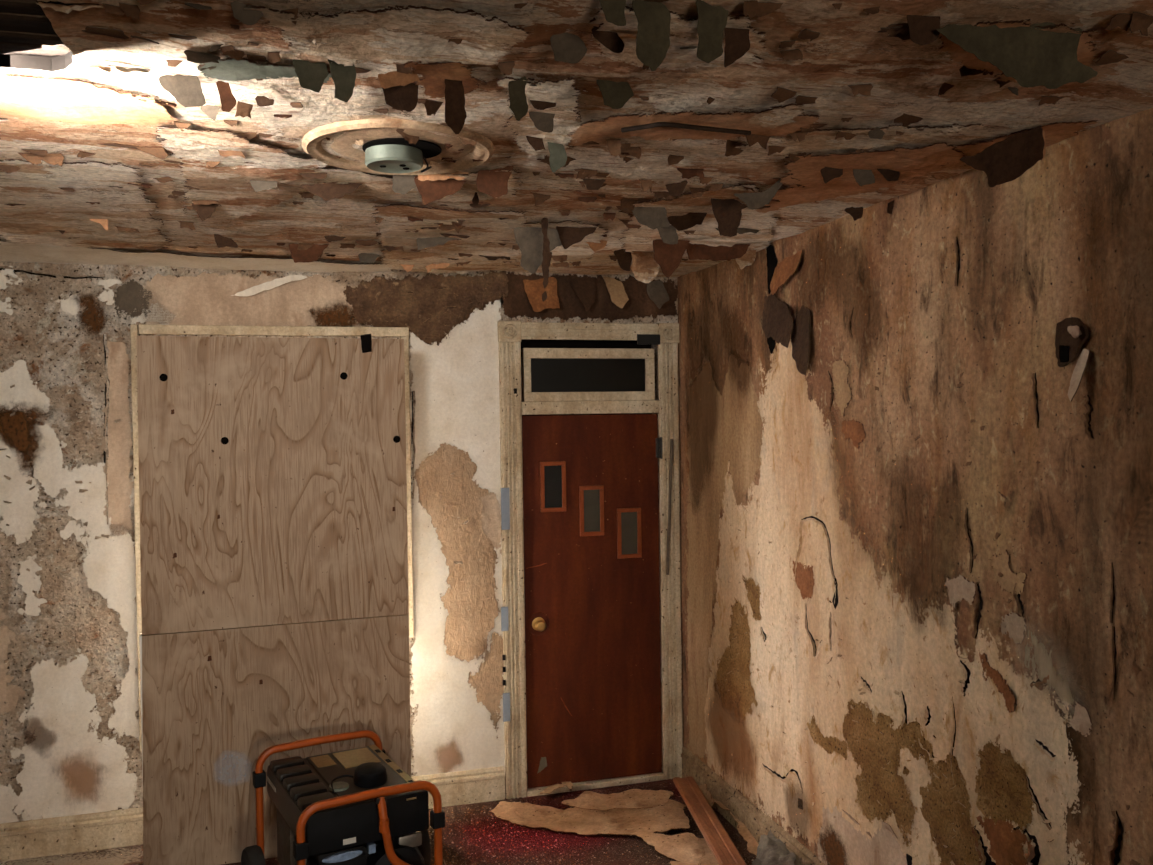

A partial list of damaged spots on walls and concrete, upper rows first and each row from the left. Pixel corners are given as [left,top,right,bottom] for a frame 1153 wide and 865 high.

peeling [878,12,1153,106]
peeling [0,0,820,315]
peeling [725,87,1098,187]
flaking render [30,279,177,325]
flaking render [0,360,139,824]
water stain [832,424,887,569]
flaking render [704,339,1096,865]
water stain [890,458,960,626]
water stain [1026,633,1074,705]
crack [1109,563,1117,699]
water stain [786,788,808,841]
crack [1108,811,1123,865]